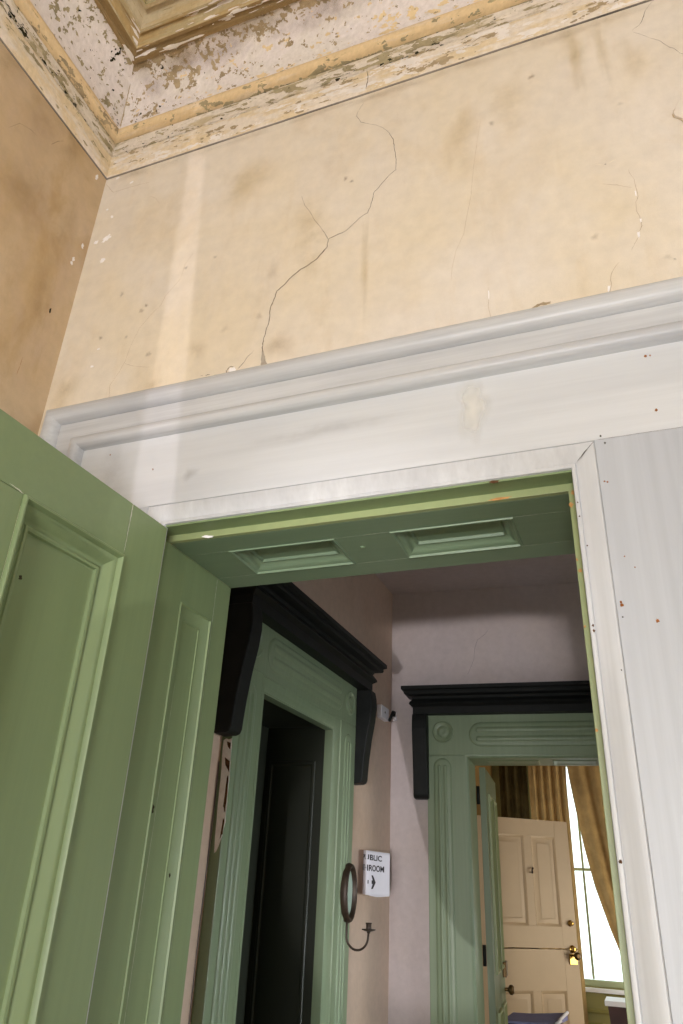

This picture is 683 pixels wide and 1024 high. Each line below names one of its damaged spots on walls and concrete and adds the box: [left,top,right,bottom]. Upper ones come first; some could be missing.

peeling [0,0,640,184]
crack [201,112,397,377]